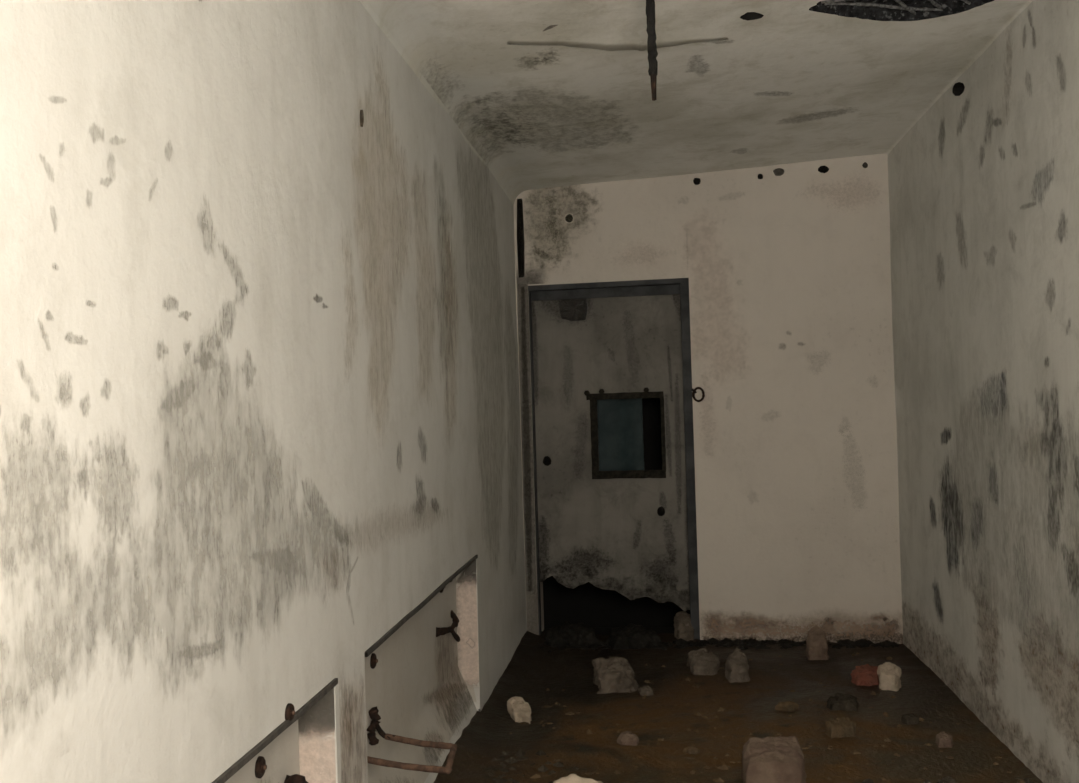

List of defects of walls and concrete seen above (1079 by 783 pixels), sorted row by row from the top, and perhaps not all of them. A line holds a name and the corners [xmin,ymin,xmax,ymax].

spalling [789,0,1008,36]
leakage [516,186,595,635]
leakage [930,464,963,567]